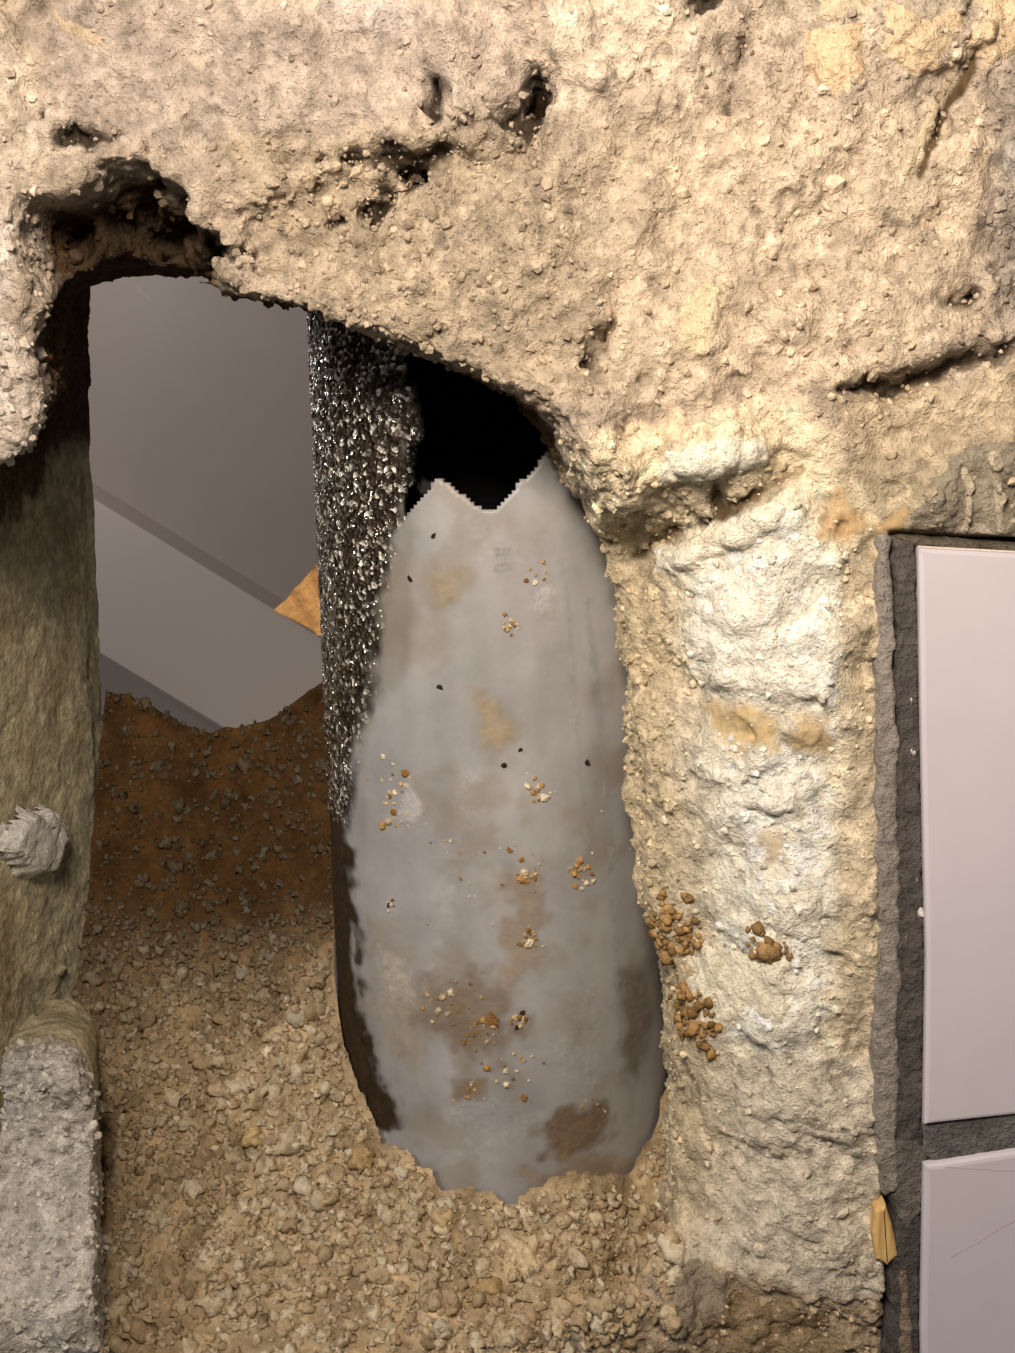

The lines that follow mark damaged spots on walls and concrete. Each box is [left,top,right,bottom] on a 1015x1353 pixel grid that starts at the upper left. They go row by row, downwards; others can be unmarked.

crack [949,291,978,306]
crack [849,345,1013,397]